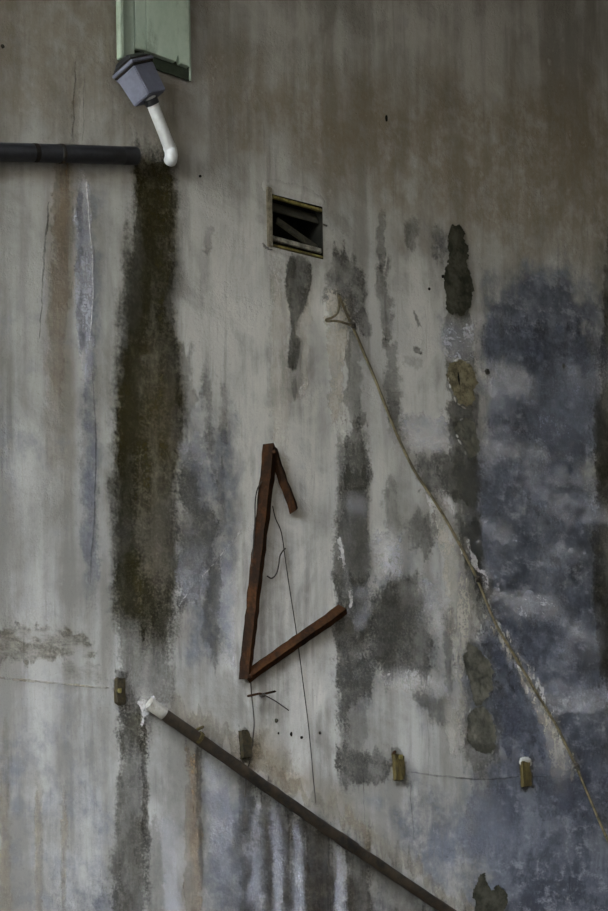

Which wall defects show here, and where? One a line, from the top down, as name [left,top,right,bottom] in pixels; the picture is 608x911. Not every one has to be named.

water stain [285,256,312,370]
flaking render [444,224,475,316]
water stain [108,152,219,645]
flaking render [446,358,480,458]
water stain [549,296,608,686]
water stain [117,709,148,765]
flaking render [463,642,498,754]
water stain [113,776,149,911]
water stain [265,803,335,911]
flaking render [472,873,508,911]